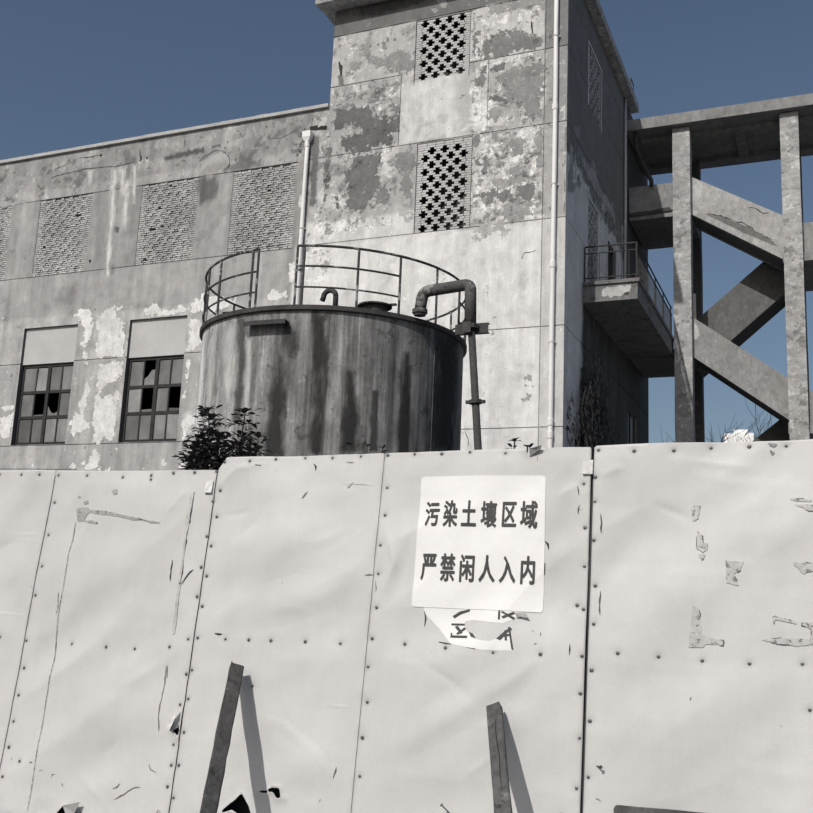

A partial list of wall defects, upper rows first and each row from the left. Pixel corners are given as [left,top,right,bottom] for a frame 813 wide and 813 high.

damp [106,165,136,276]
peeling [267,262,295,301]
peeling [0,405,14,438]
peeling [68,304,126,471]
peeling [144,293,236,398]
rust [206,317,252,419]
rust [266,360,285,456]
rust [310,312,327,454]
rust [341,373,358,452]
rust [370,390,378,451]
rust [398,353,410,453]
rust [433,335,457,451]